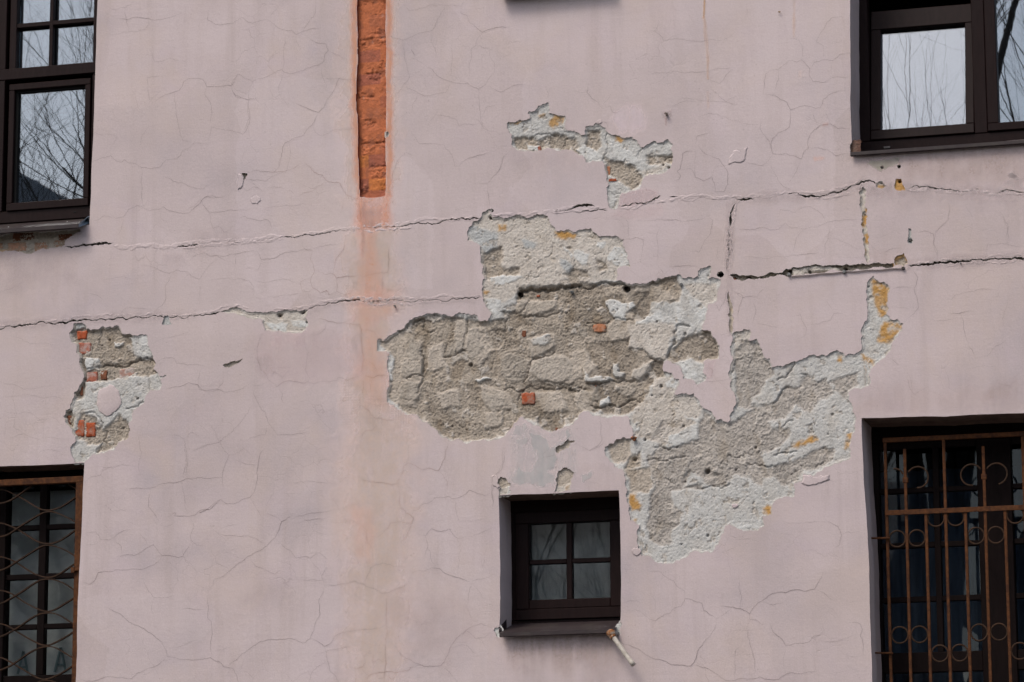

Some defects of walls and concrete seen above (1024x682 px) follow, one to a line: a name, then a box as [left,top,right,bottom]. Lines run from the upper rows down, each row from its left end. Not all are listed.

crack [0,3,894,337]
spalling [507,103,673,209]
spalling [64,321,166,465]
spalling [222,307,308,333]
spalling [377,209,913,564]
crack [899,186,1024,312]